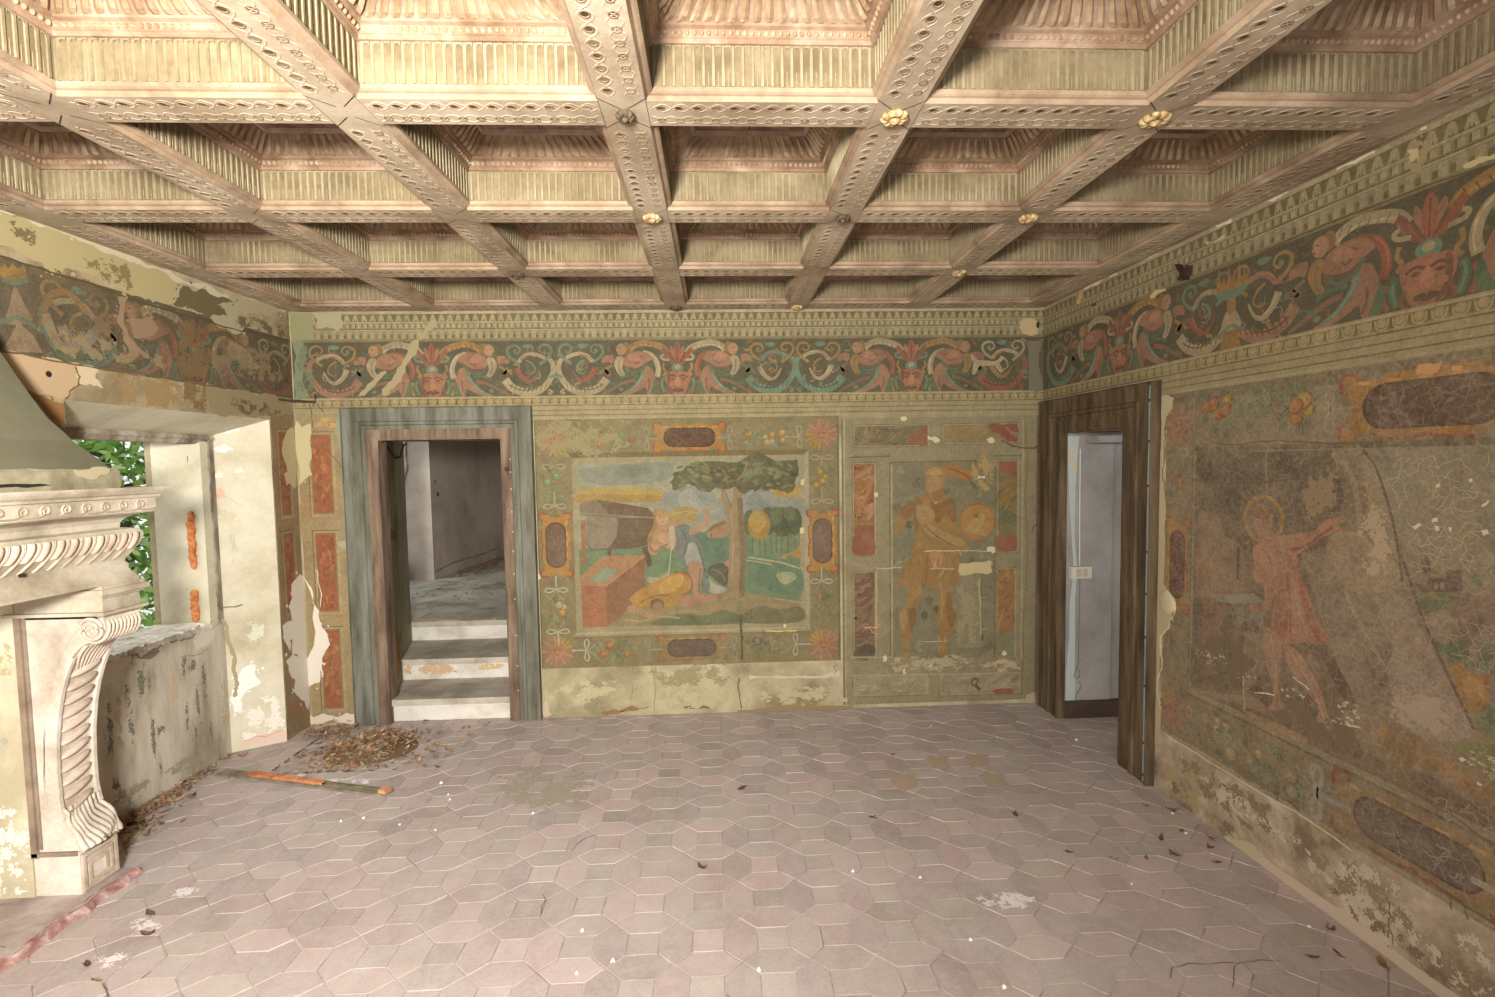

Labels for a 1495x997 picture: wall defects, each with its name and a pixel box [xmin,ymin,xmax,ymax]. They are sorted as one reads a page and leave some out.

flaking render [0,210,297,489]
crack [1212,440,1360,493]
flaking render [229,661,264,716]
flaking render [283,571,355,724]
crack [1156,609,1352,851]
crack [1349,761,1495,846]
flaking render [1225,831,1460,997]
crack [1382,901,1393,945]
crack [1429,879,1495,930]
crack [1170,959,1280,987]